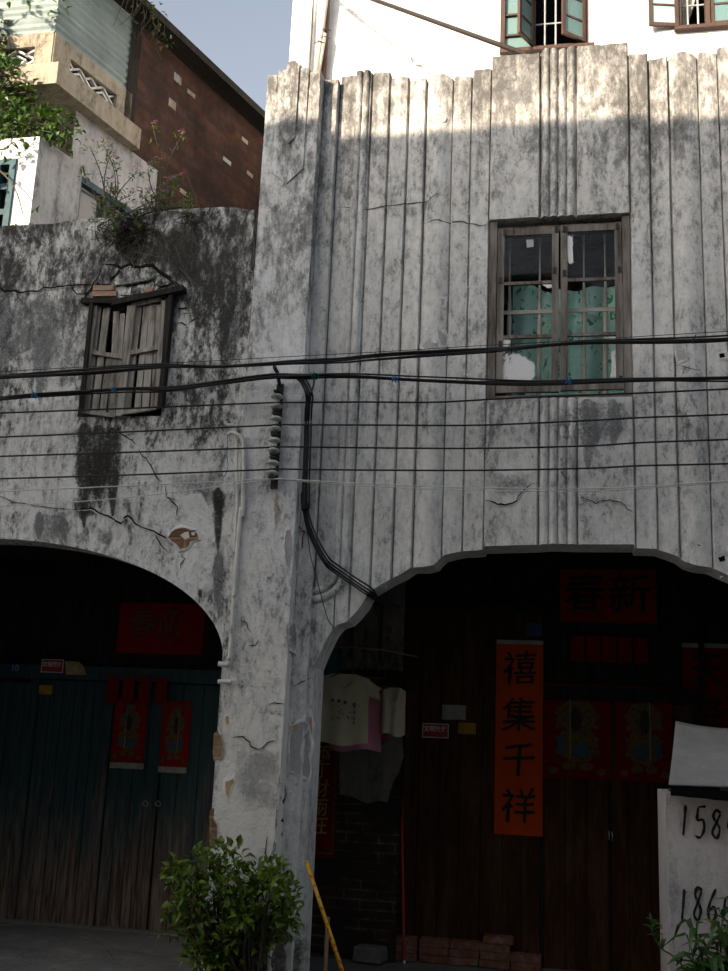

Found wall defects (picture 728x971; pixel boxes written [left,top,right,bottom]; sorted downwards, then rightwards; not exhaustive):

crack [338,193,489,226]
crack [0,263,197,325]
leakage [35,423,121,542]
crack [107,427,178,516]
crack [0,496,185,568]
spalling [166,524,202,553]
spalling [213,716,229,761]
crack [232,736,275,750]
spalling [287,712,315,786]
spalling [209,808,217,849]